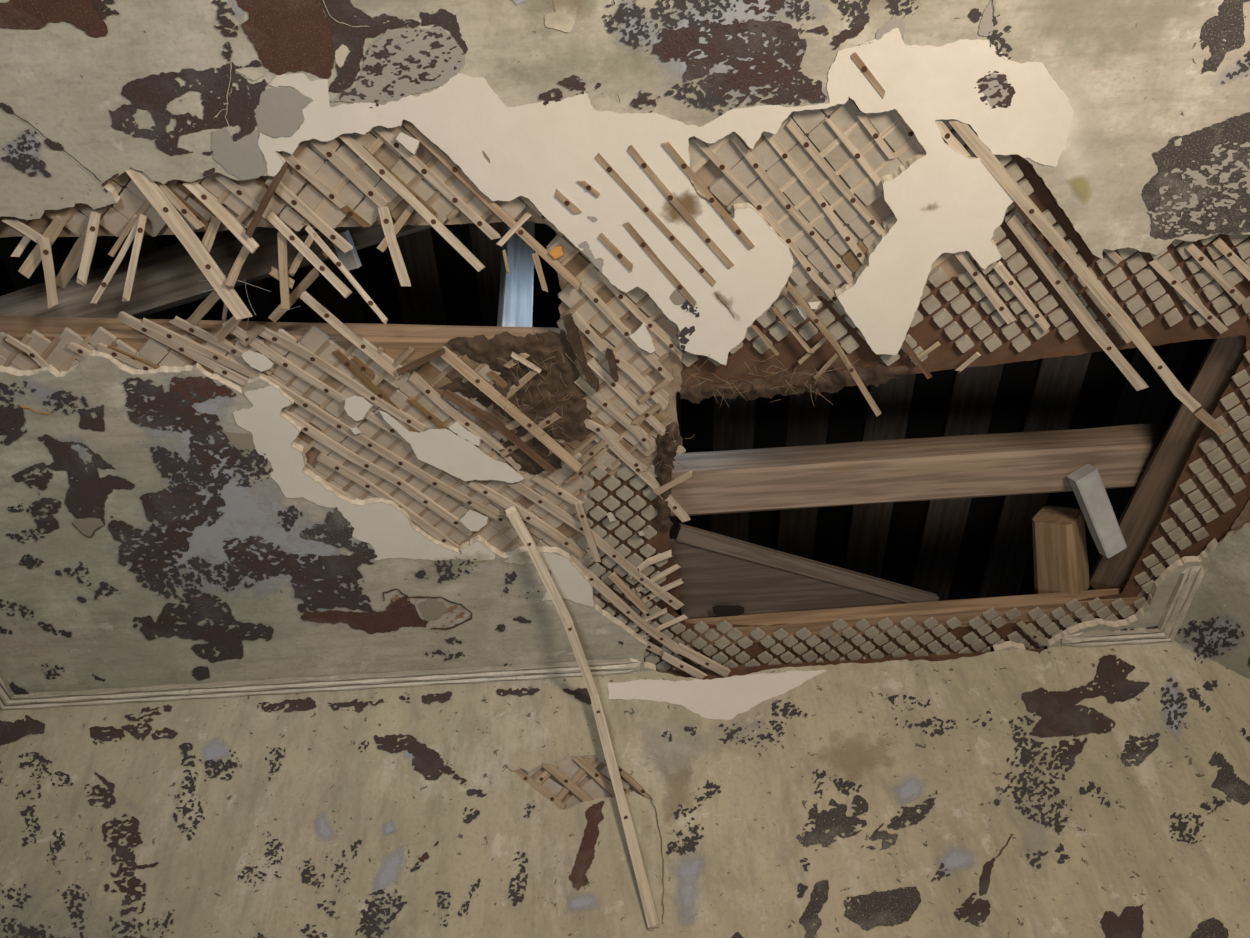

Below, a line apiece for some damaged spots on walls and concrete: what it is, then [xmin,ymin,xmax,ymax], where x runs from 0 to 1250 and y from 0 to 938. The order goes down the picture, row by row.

peeling [1200,0,1250,84]
peeling [1,129,51,177]
crack [0,102,119,193]
flaking render [108,0,1097,365]
peeling [1142,112,1250,239]
peeling [0,376,594,681]
peeling [0,708,175,938]
peeling [257,697,384,713]
peeling [563,688,592,704]
peeling [886,695,992,737]
peeling [994,655,1218,868]
peeling [1170,752,1250,844]